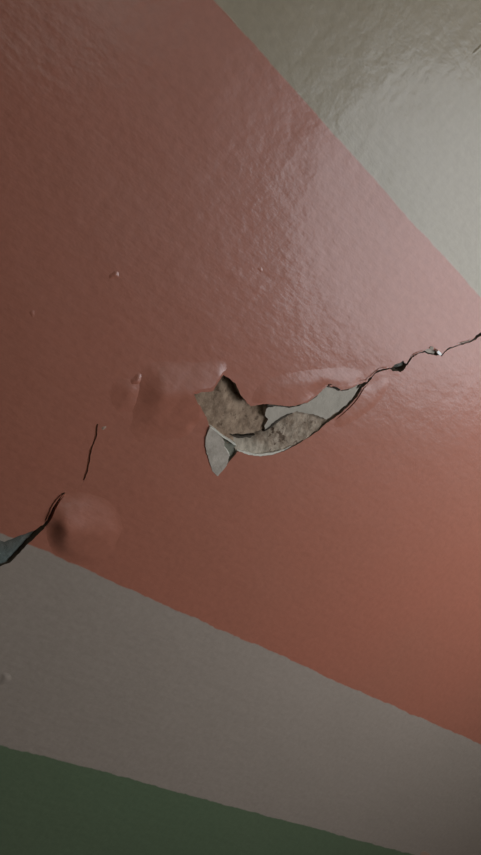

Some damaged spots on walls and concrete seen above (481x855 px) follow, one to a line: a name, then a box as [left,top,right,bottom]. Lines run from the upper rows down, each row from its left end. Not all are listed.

crack [360,346,442,382]
crack [83,424,98,480]
flaking render [194,375,361,476]